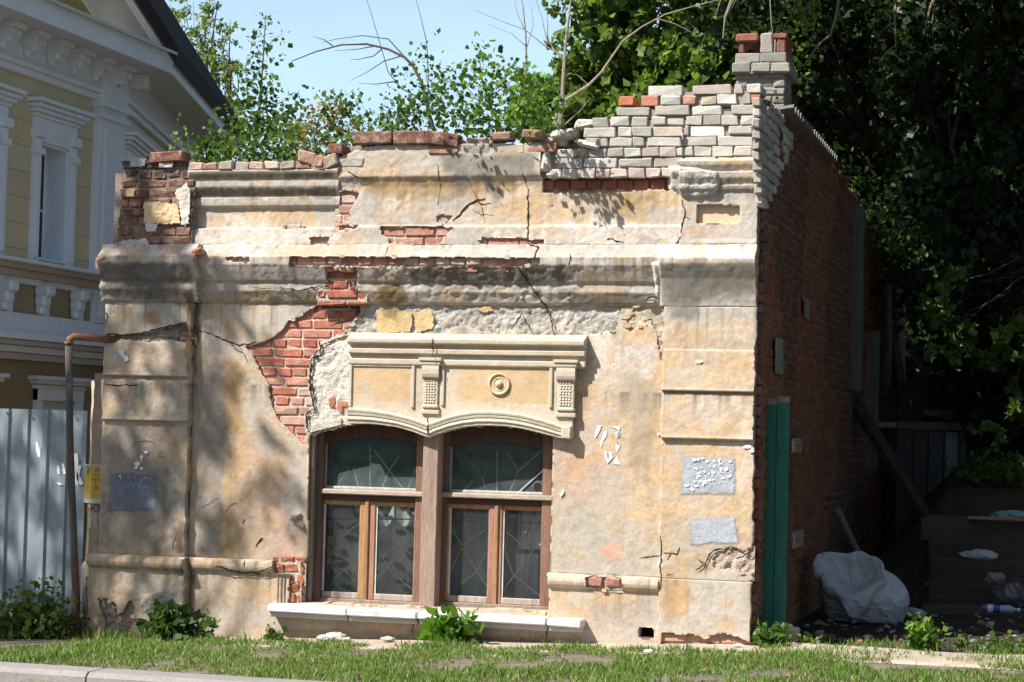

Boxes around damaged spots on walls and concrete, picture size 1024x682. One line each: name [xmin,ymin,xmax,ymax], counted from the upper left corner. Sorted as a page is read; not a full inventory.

flaking render [117,156,197,245]
crack [438,170,491,223]
crack [511,171,555,335]
crack [106,313,256,360]
flaking render [247,190,663,444]
crack [201,498,275,575]
flaking render [272,556,308,603]
crack [643,536,749,589]
flaking render [98,597,136,631]
flaking render [661,633,762,645]